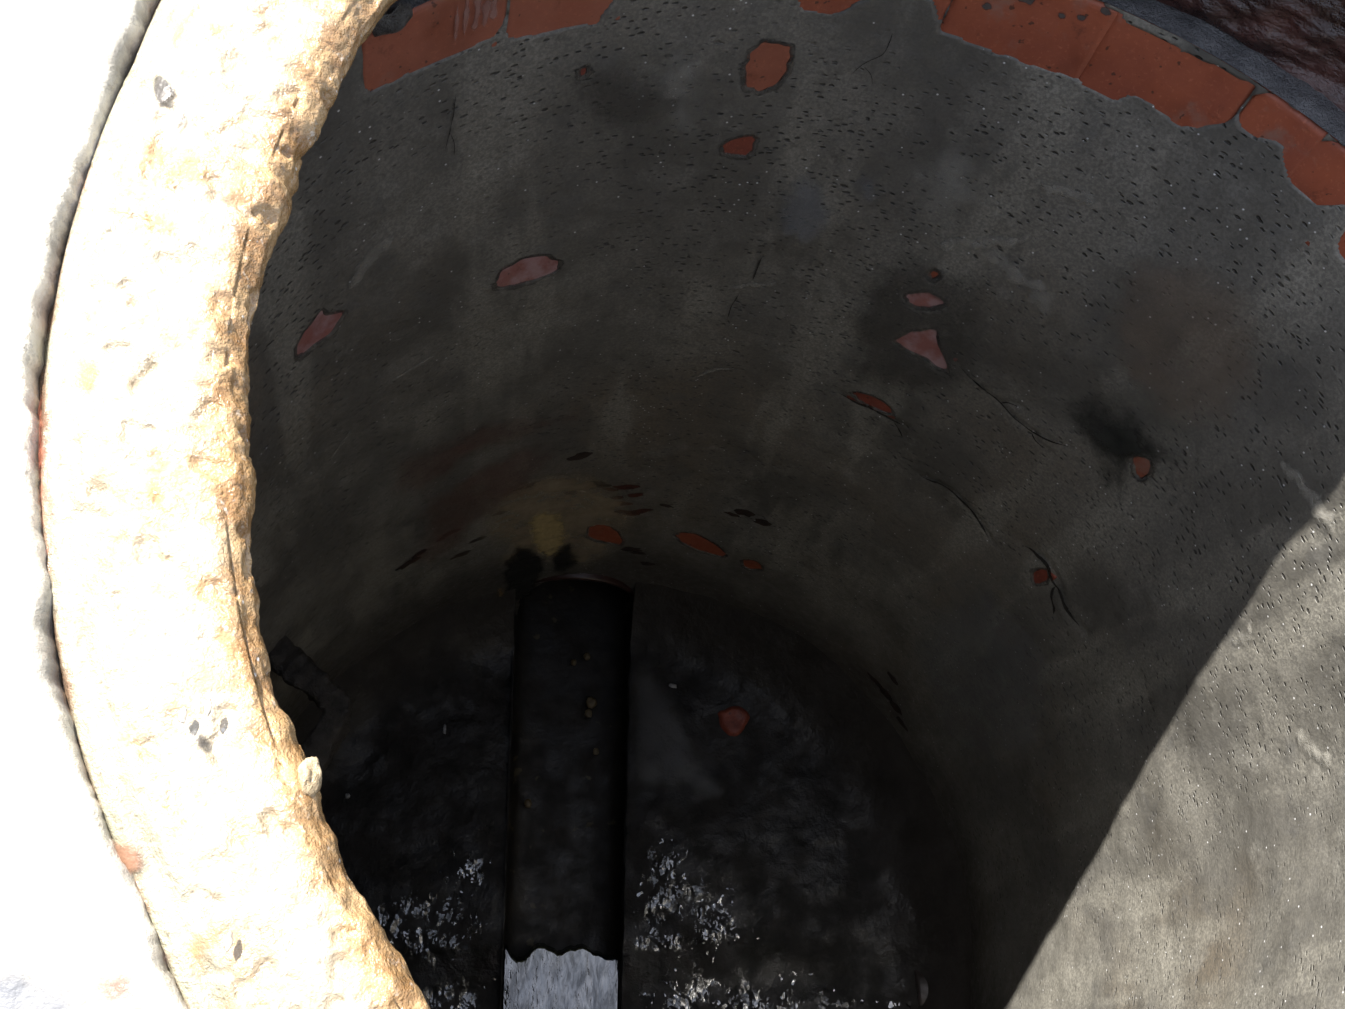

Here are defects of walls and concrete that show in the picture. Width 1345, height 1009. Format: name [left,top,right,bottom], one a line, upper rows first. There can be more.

peeling [372,3,413,37]
spalling [740,39,795,95]
spalling [492,254,564,291]
spalling [903,268,947,311]
spalling [294,309,347,361]
spalling [892,328,958,373]
crack [839,393,902,436]
crack [961,368,1066,449]
water stain [1075,411,1158,466]
crack [923,477,988,537]
crack [1025,546,1079,625]
flaking render [718,706,750,736]